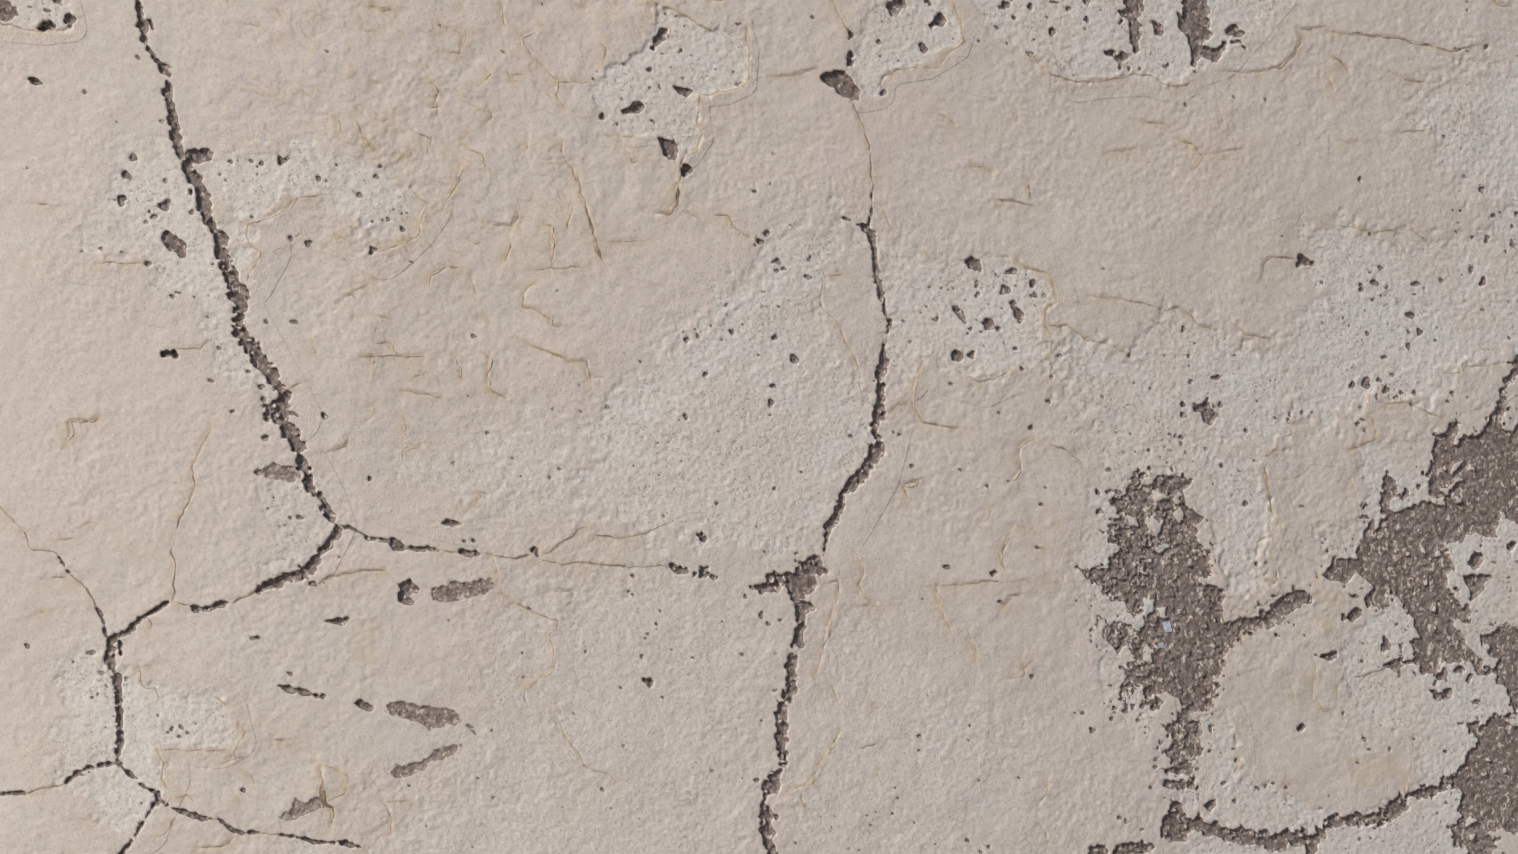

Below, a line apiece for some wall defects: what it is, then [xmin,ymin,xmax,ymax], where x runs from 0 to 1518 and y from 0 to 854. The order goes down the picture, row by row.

peeling [0,0,87,45]
spalling [278,671,326,699]
spalling [324,616,349,626]
crack [0,0,718,854]
crack [649,0,965,854]
peeling [346,0,1518,854]